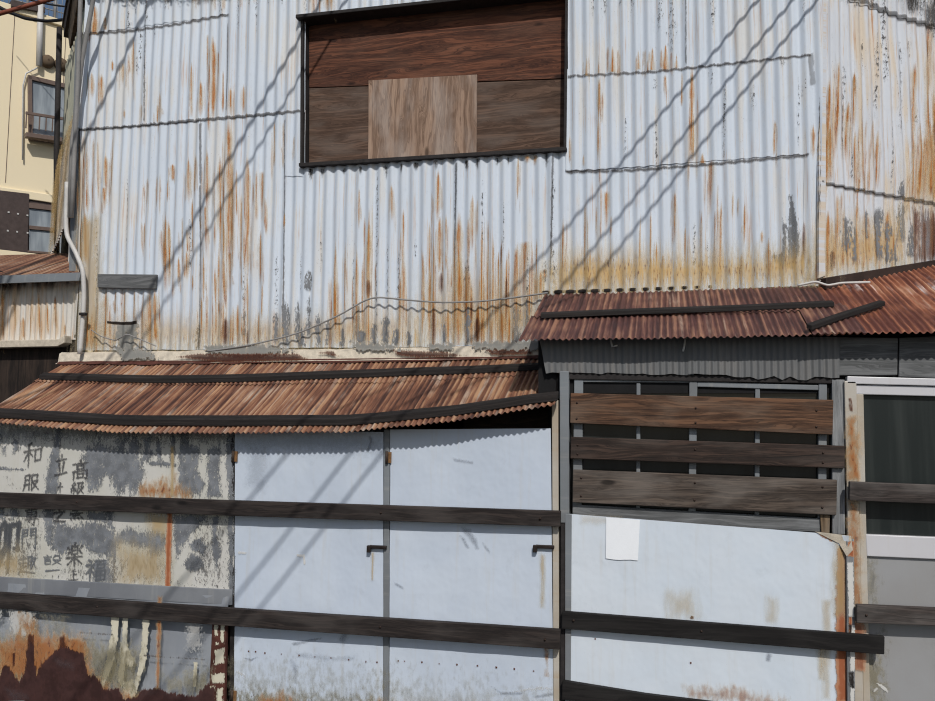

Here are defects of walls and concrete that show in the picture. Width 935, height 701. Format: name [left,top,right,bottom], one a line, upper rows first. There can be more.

rust [163,127,267,343]
rust [421,68,903,343]
rust [910,67,935,260]
rust [330,223,376,341]
peeling [0,423,235,500]
rust [846,398,860,480]
peeling [42,509,236,598]
rust [819,503,866,634]
peeling [0,609,36,641]
peeling [109,617,150,698]
peeling [210,625,225,701]
rust [835,651,866,701]